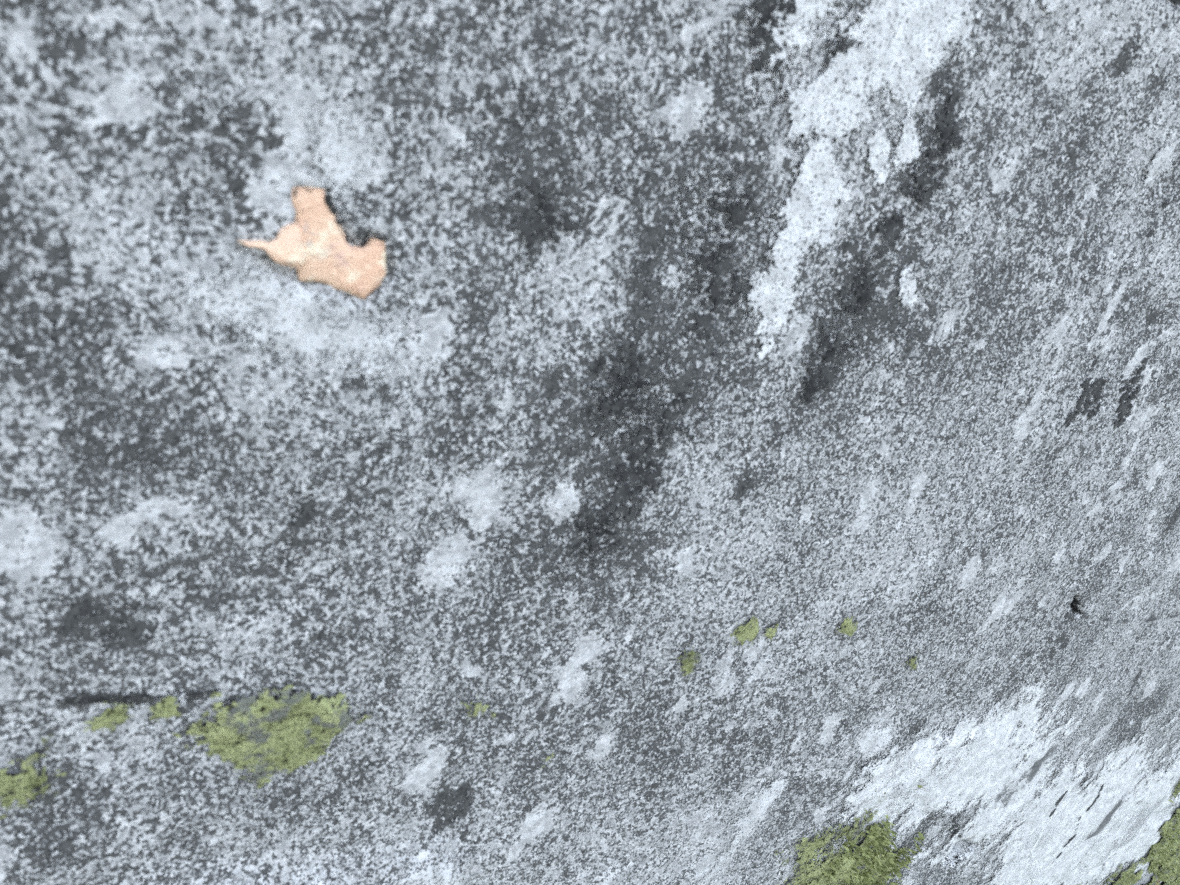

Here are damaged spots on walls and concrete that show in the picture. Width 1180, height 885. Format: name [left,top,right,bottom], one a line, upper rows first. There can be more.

crack [1,689,220,714]